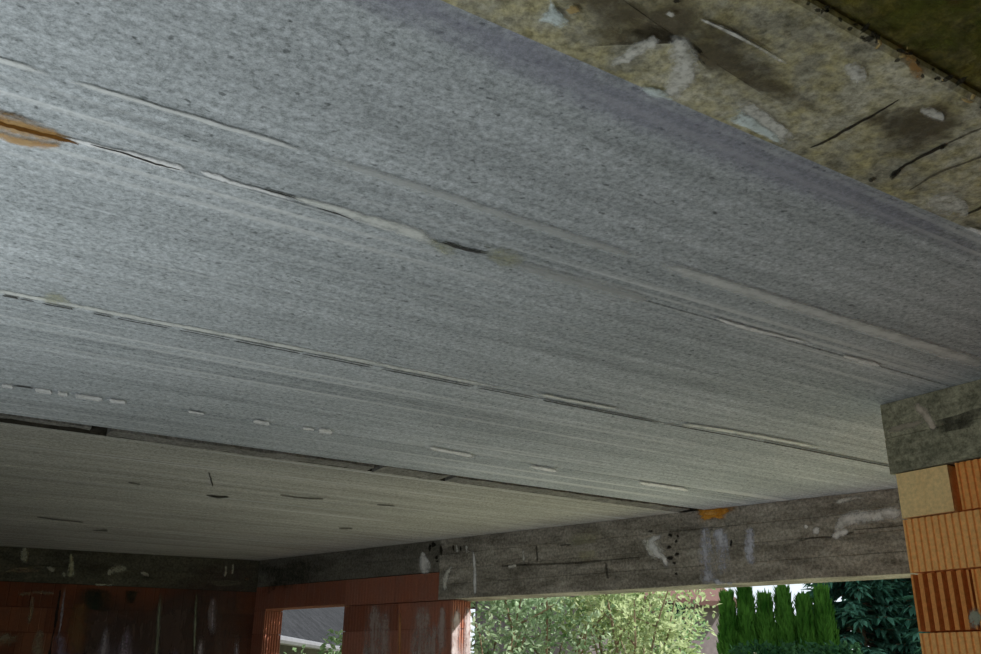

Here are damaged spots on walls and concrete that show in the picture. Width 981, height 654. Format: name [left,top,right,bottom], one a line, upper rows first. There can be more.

water stain [540,0,795,100]
rust [0,111,78,148]
crack [811,100,898,148]
water stain [869,106,955,151]
crack [868,128,981,189]
crack [0,290,889,467]